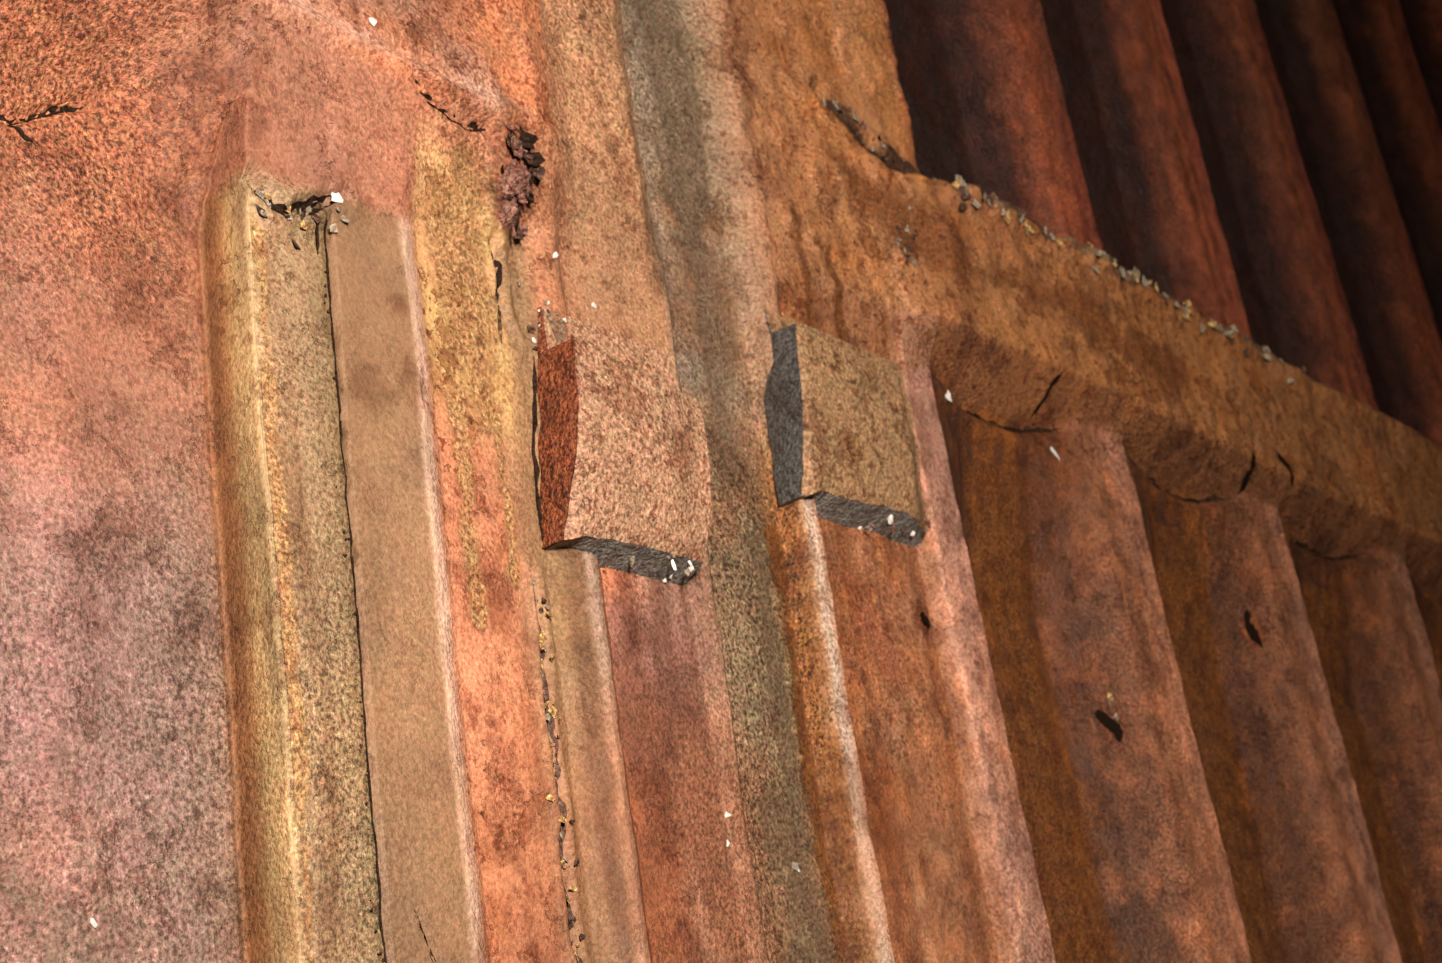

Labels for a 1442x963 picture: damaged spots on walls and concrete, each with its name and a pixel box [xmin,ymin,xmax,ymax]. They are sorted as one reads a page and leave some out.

crack [0,105,83,142]
crack [414,909,437,963]